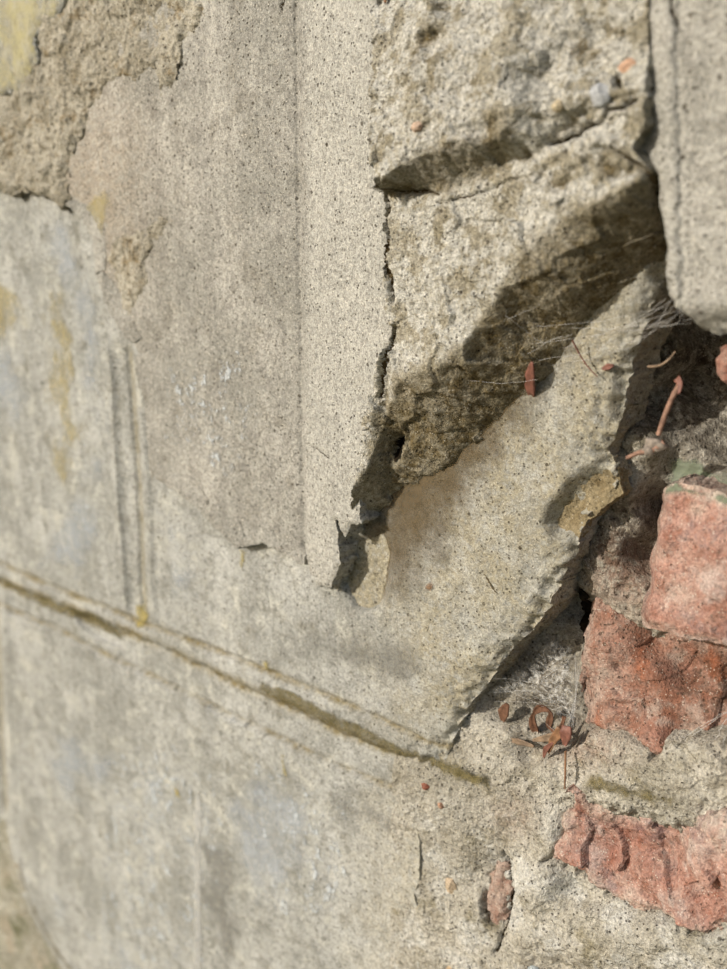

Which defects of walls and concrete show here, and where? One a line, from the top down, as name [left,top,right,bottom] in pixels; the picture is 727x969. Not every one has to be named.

spalling [0,0,210,342]
crack [379,328,397,397]
crack [374,177,523,300]
spalling [350,0,668,512]
crack [552,74,633,146]
spalling [389,308,727,969]